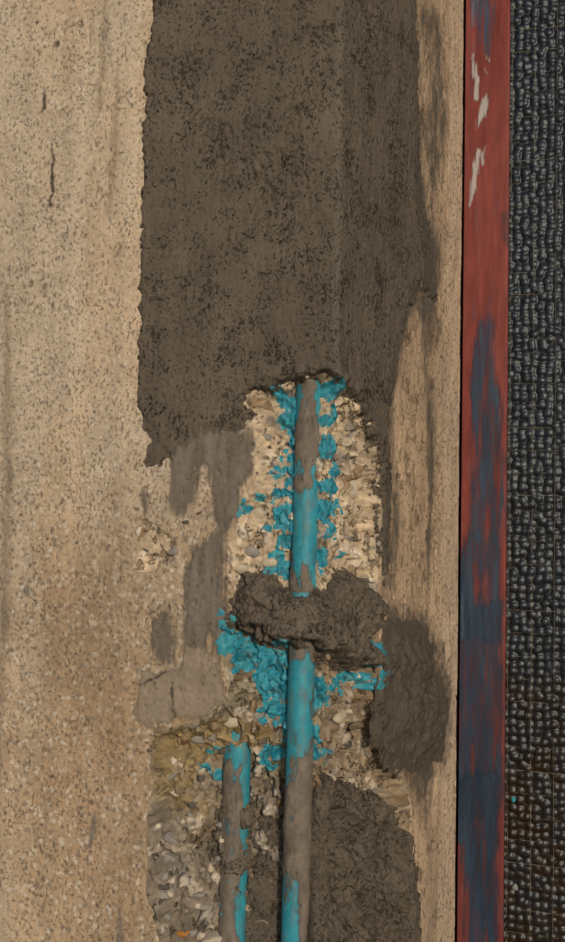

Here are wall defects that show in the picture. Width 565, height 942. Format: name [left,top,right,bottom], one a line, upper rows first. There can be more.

spalling [133,519,179,574]
spalling [226,373,382,592]
spalling [145,608,299,942]
spalling [311,631,410,832]